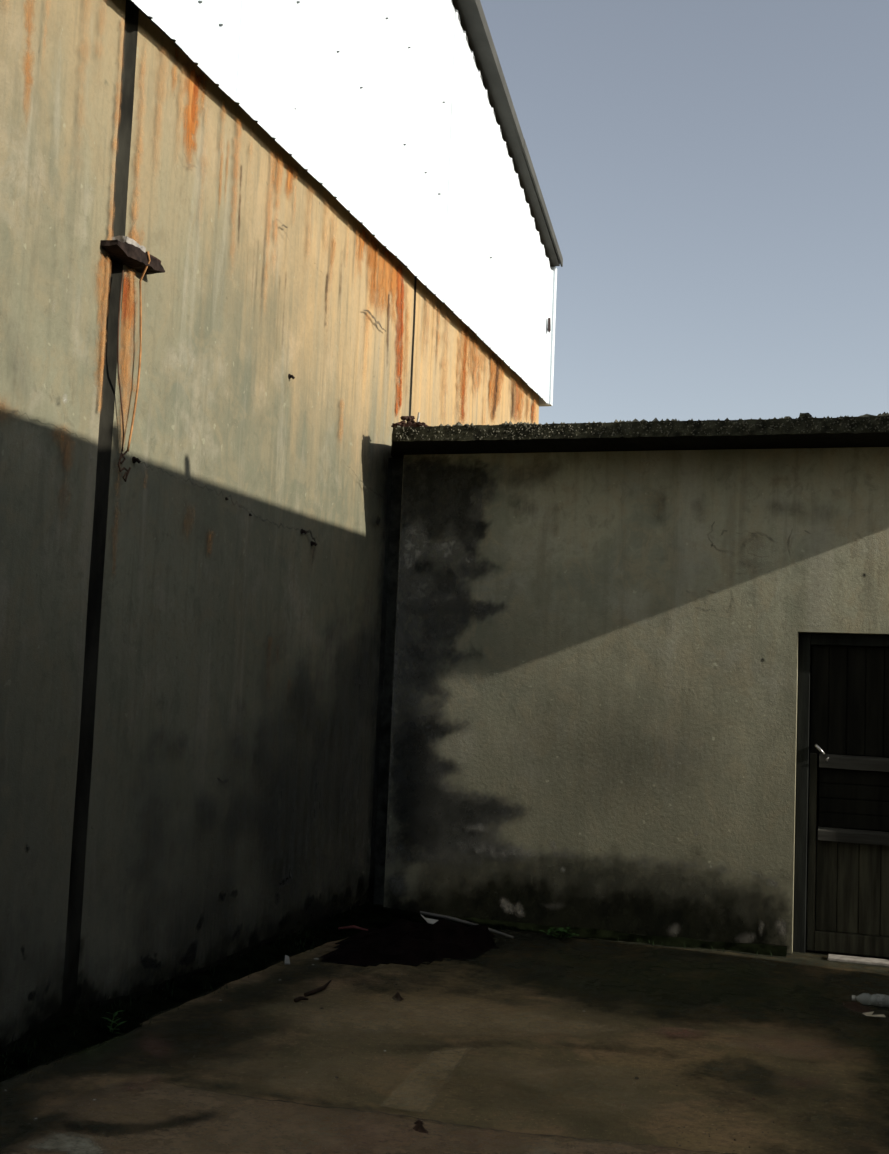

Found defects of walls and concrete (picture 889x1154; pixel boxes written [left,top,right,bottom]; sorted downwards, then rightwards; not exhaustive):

rust [173,48,207,153]
rust [99,257,110,384]
rust [120,267,135,381]
rust [357,227,409,415]
rust [457,332,536,422]
water stain [391,457,534,868]
water stain [0,929,889,1154]